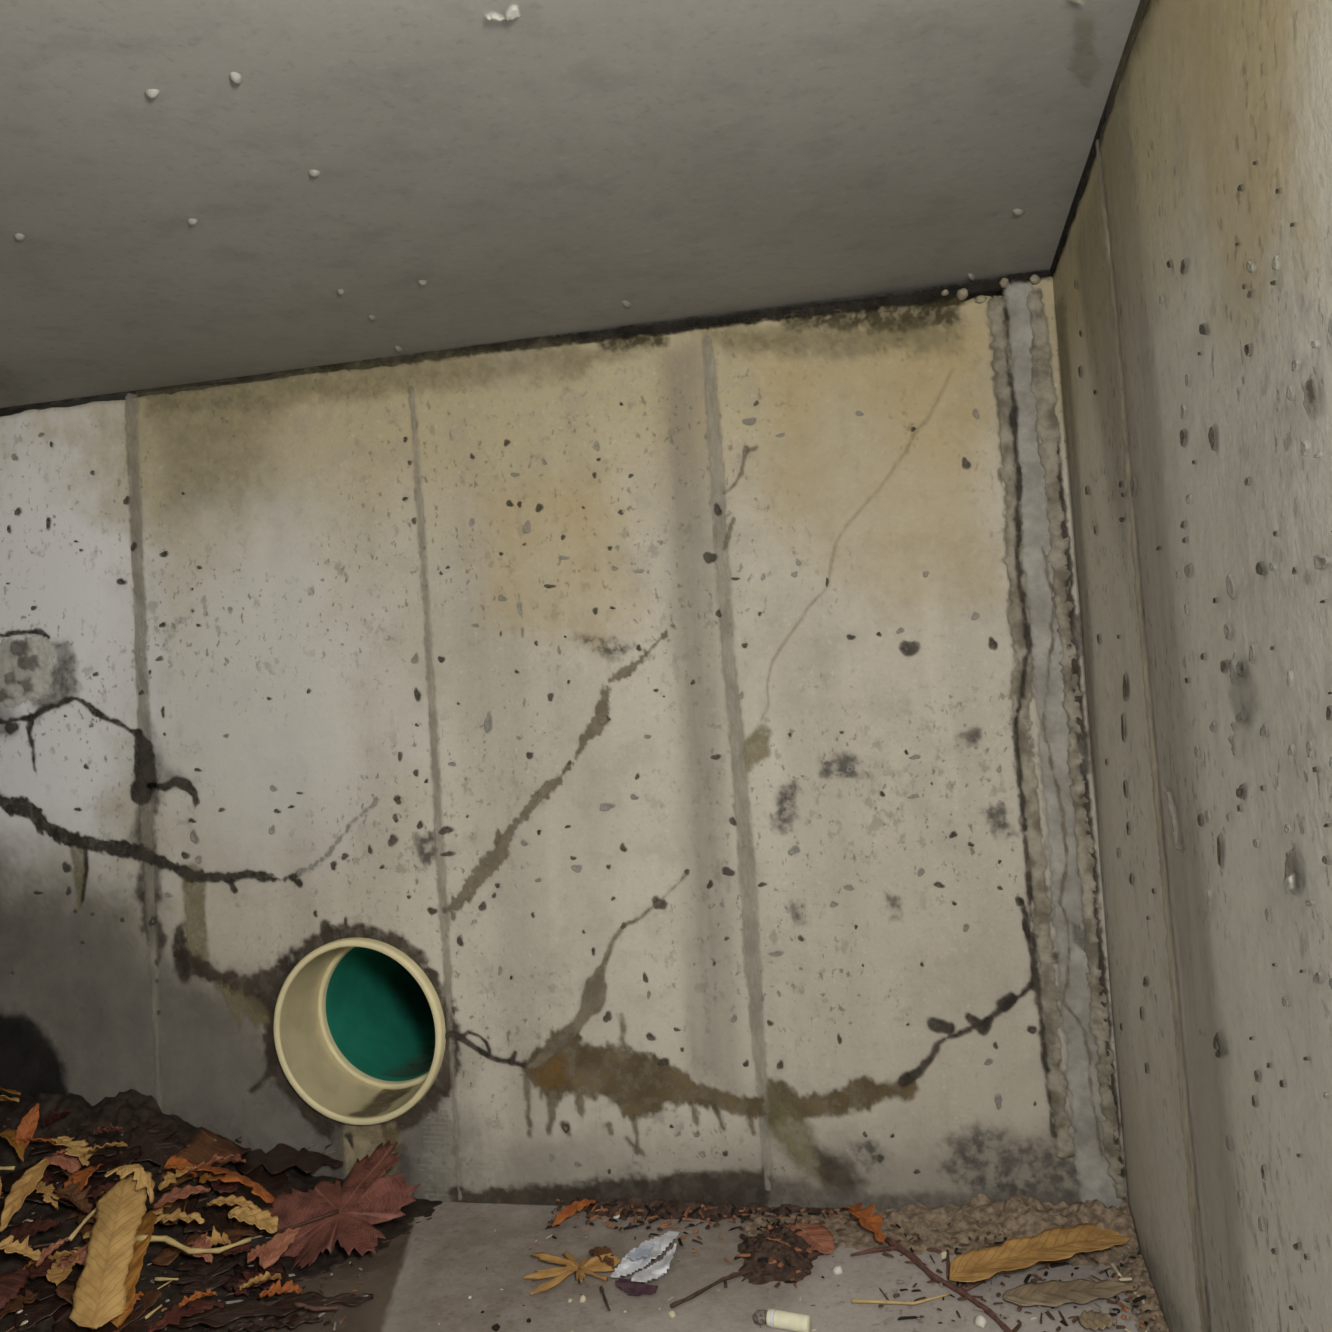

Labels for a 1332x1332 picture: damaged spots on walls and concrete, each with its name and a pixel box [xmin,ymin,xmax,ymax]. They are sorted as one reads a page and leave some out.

crack [0,0,1148,1177]
peeling [0,636,54,707]
water stain [38,644,76,708]
water stain [0,772,966,1211]
water stain [947,1135,1080,1206]